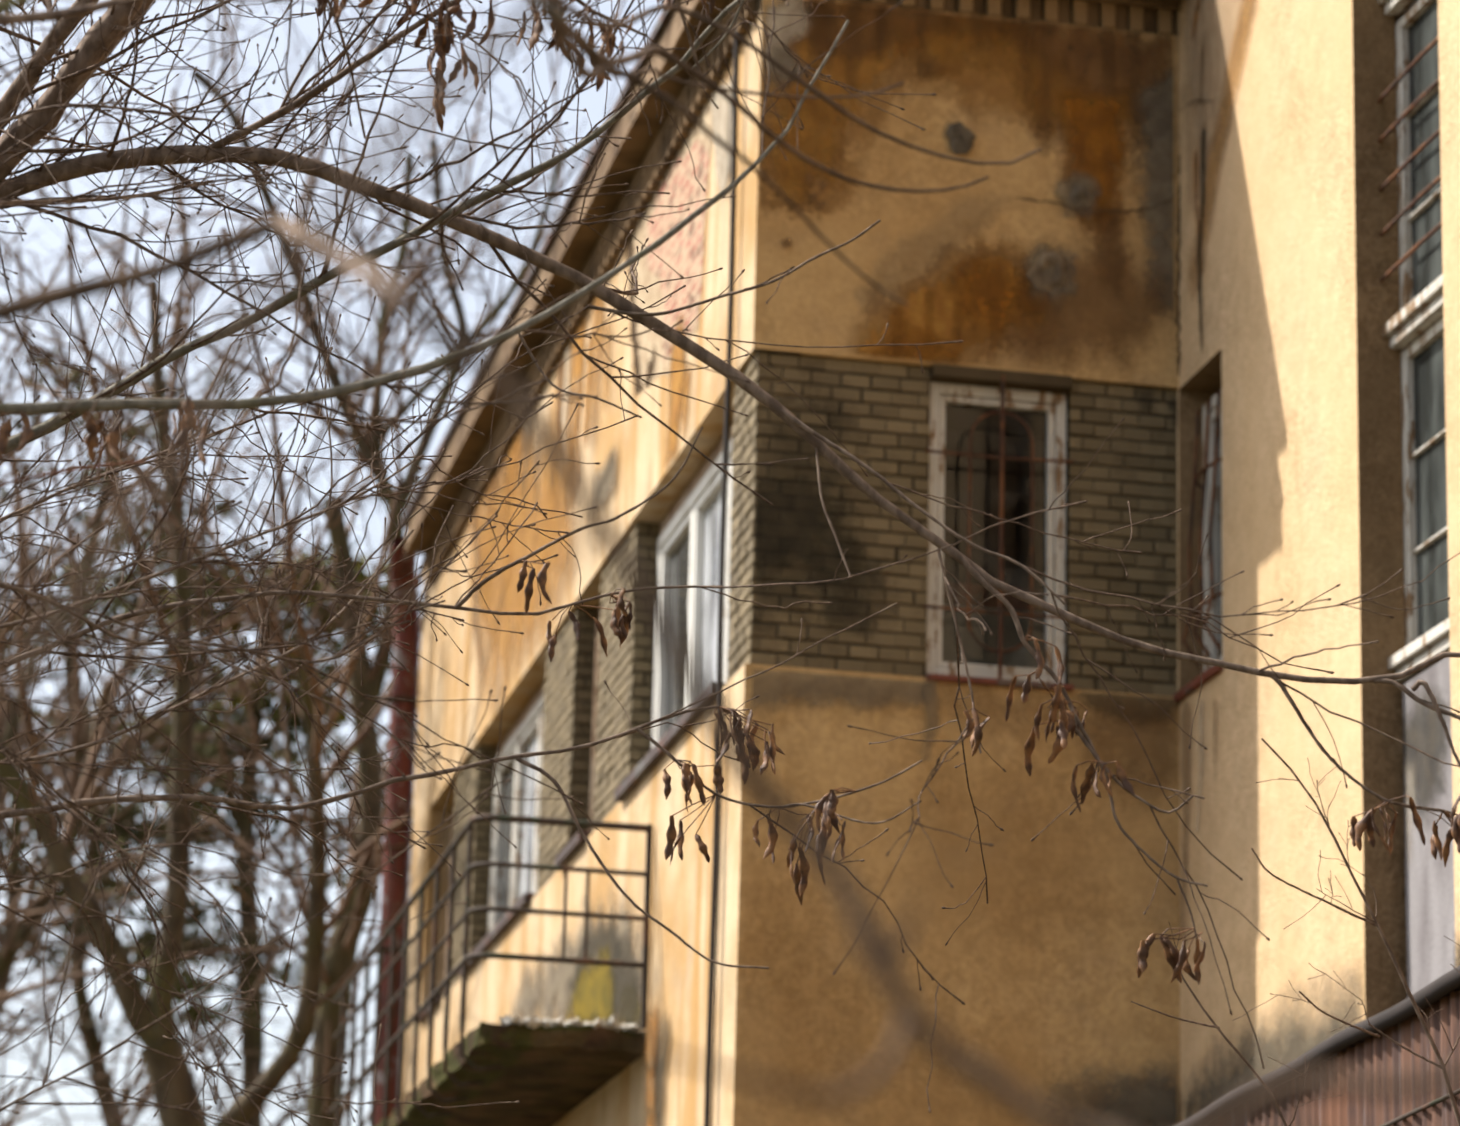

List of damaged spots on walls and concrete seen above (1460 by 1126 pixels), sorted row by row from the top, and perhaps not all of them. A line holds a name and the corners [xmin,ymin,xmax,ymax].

spalling [946,122,976,155]
water stain [762,0,1247,362]
corrosion [1063,94,1129,278]
crack [1015,34,1216,375]
water stain [511,898,643,1027]